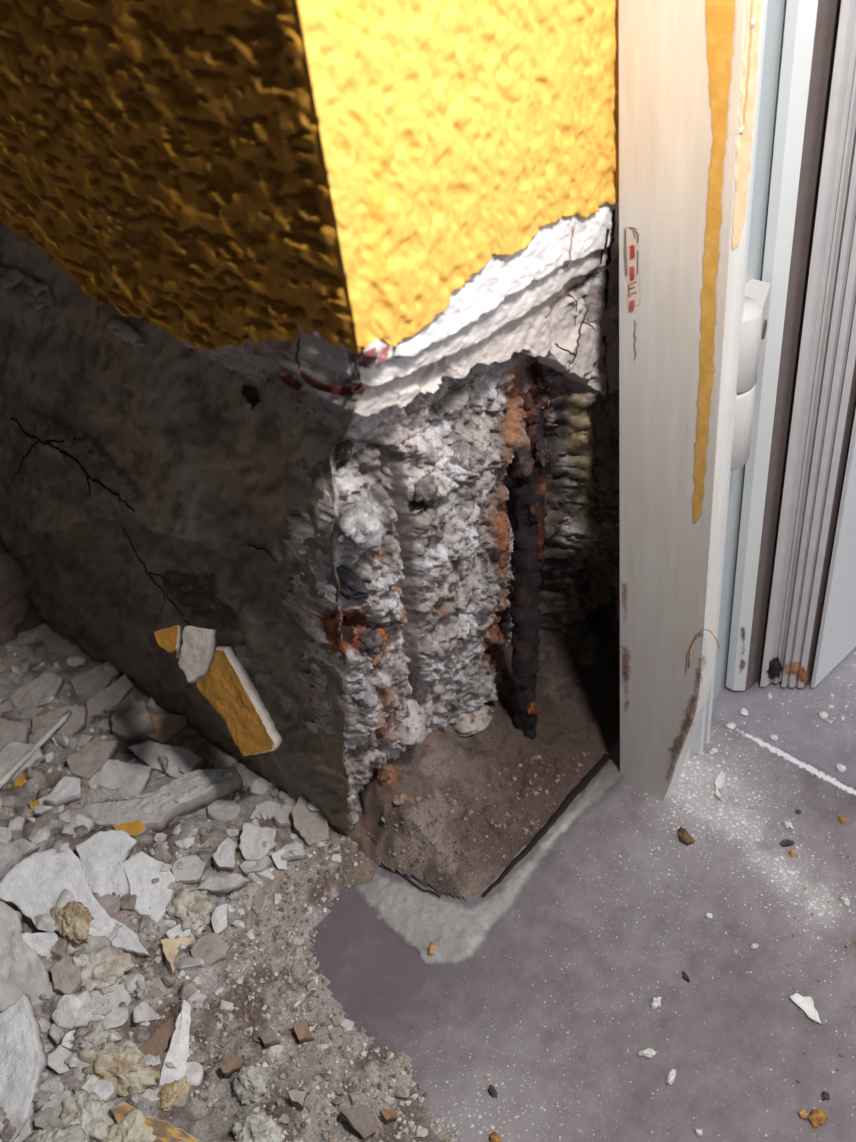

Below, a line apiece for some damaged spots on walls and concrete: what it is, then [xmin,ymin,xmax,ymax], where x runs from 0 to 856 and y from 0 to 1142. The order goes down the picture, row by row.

flaking render [105,319,147,347]
crack [544,209,615,377]
crack [10,418,190,626]
spalling [180,203,620,835]
rust [484,361,553,674]
rust [318,608,388,666]